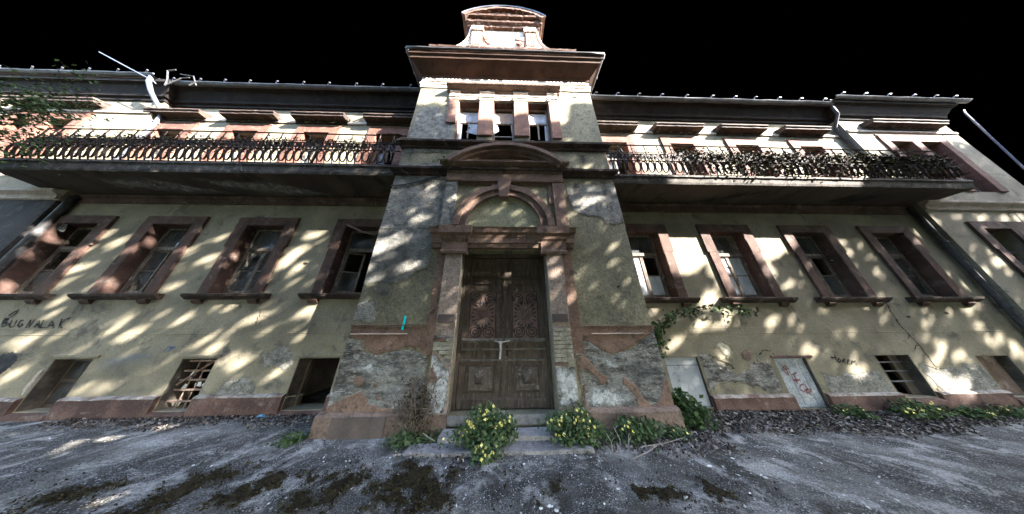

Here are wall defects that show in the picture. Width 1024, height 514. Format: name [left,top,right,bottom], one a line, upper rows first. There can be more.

spalling [328,335,453,414]
spalling [553,328,667,410]
spalling [699,339,784,394]